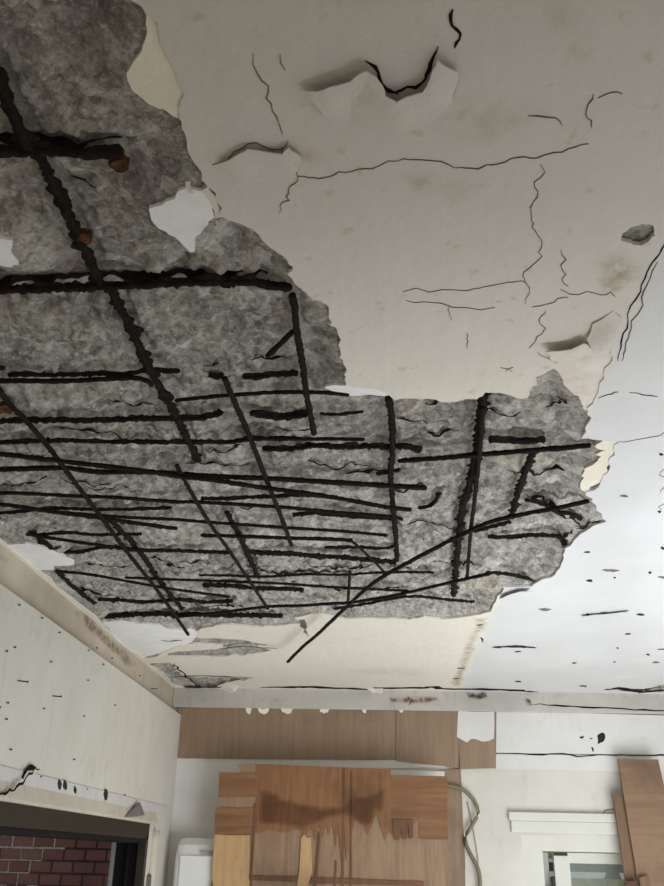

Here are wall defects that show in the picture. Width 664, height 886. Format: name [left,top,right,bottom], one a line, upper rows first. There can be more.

crack [365,9,462,95]
crack [212,53,288,165]
crack [280,91,664,363]
spalling [621,224,654,242]
spalling [0,0,622,693]
crack [173,663,664,711]
crack [0,765,40,795]
crack [504,751,664,759]